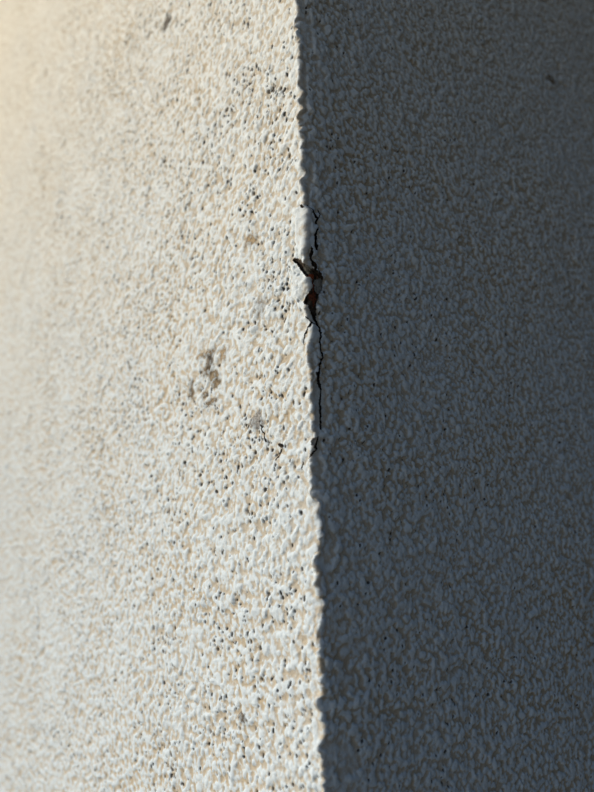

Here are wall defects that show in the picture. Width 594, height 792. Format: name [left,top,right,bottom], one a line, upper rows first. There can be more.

crack [300,204,321,251]
crack [301,311,324,470]